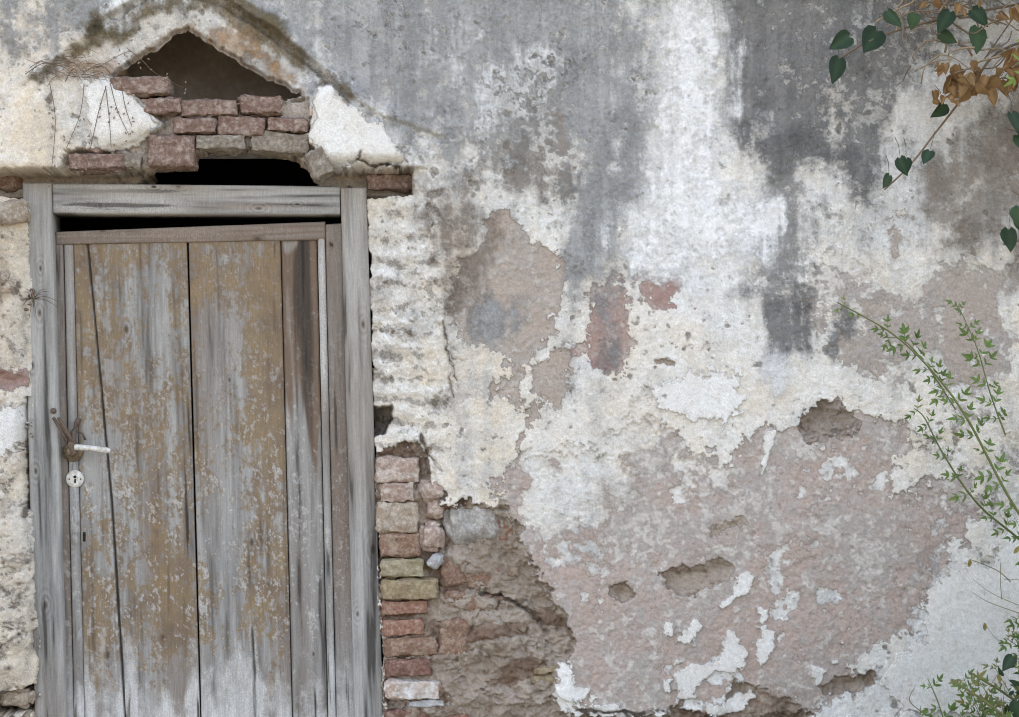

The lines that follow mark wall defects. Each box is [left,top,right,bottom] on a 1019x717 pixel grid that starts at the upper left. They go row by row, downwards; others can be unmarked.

water stain [0,0,142,57]
peeling [78,76,159,154]
water stain [249,0,998,396]
water stain [924,102,1019,246]
flaking render [376,208,1019,717]